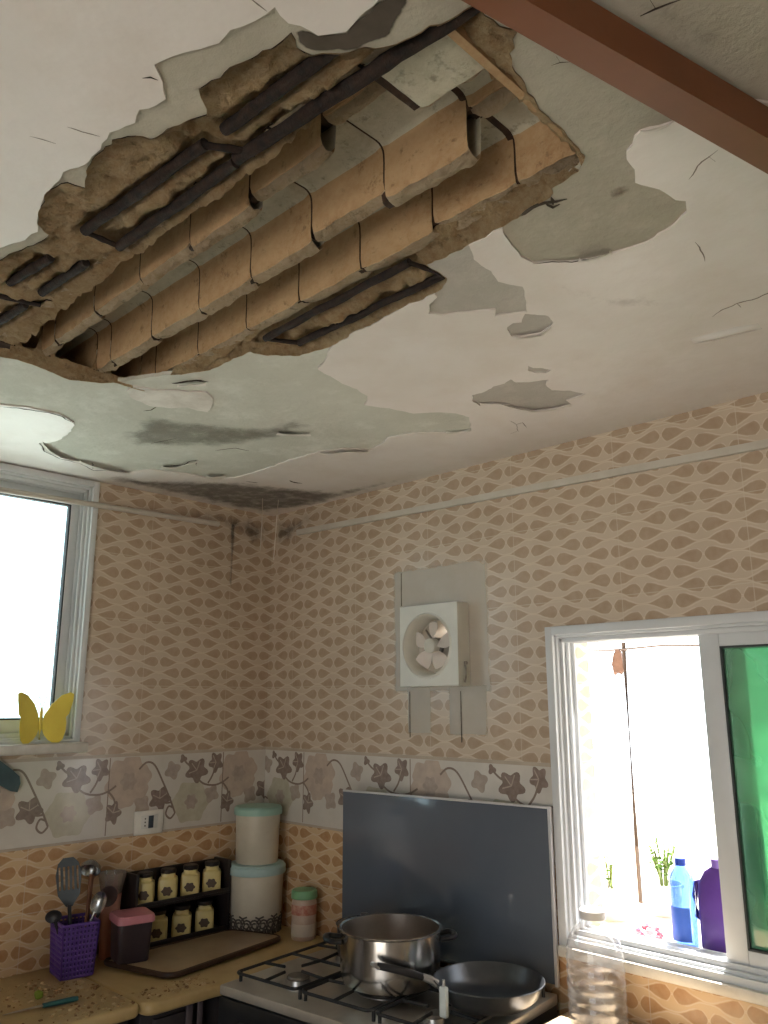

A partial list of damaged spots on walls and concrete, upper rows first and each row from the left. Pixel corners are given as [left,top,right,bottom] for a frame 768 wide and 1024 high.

peeling [591,0,768,100]
spalling [0,0,687,480]
water stain [131,481,330,509]